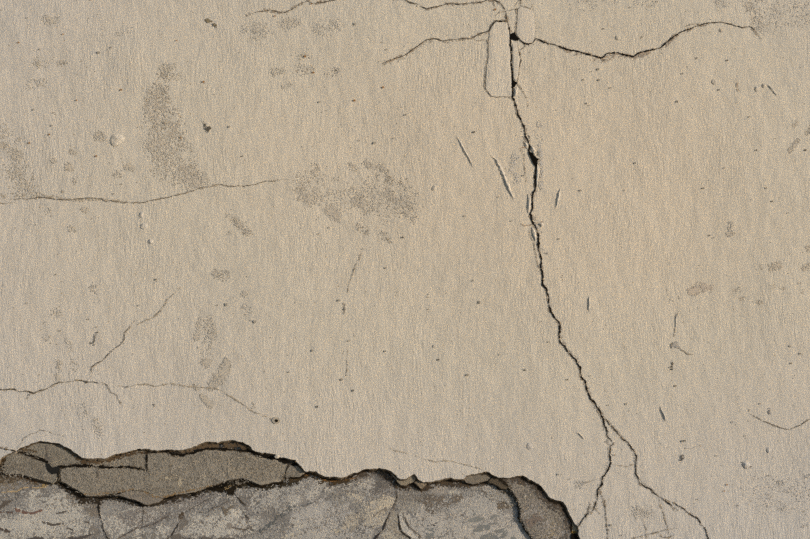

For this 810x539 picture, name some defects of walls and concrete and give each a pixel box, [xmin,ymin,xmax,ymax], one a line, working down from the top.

crack [245,0,335,17]
crack [0,179,289,204]
crack [387,0,760,539]
crack [0,287,271,420]
crack [748,409,810,430]
crack [373,490,421,539]